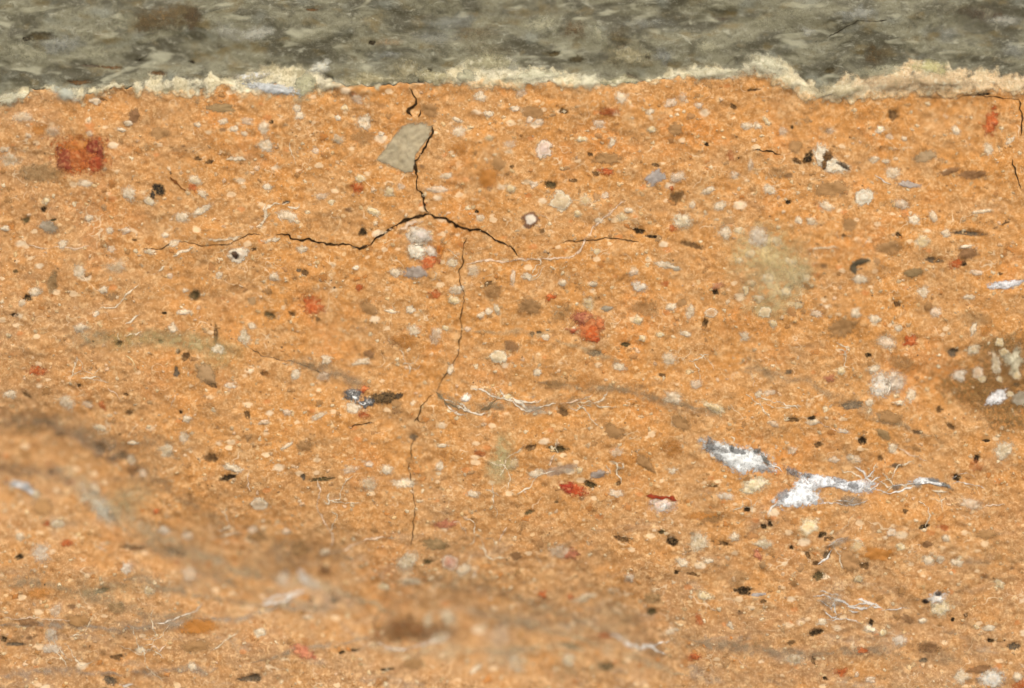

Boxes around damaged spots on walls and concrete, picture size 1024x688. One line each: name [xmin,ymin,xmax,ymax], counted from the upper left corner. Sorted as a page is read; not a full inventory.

crack [563,236,638,244]
crack [145,89,519,547]
water stain [698,438,983,515]